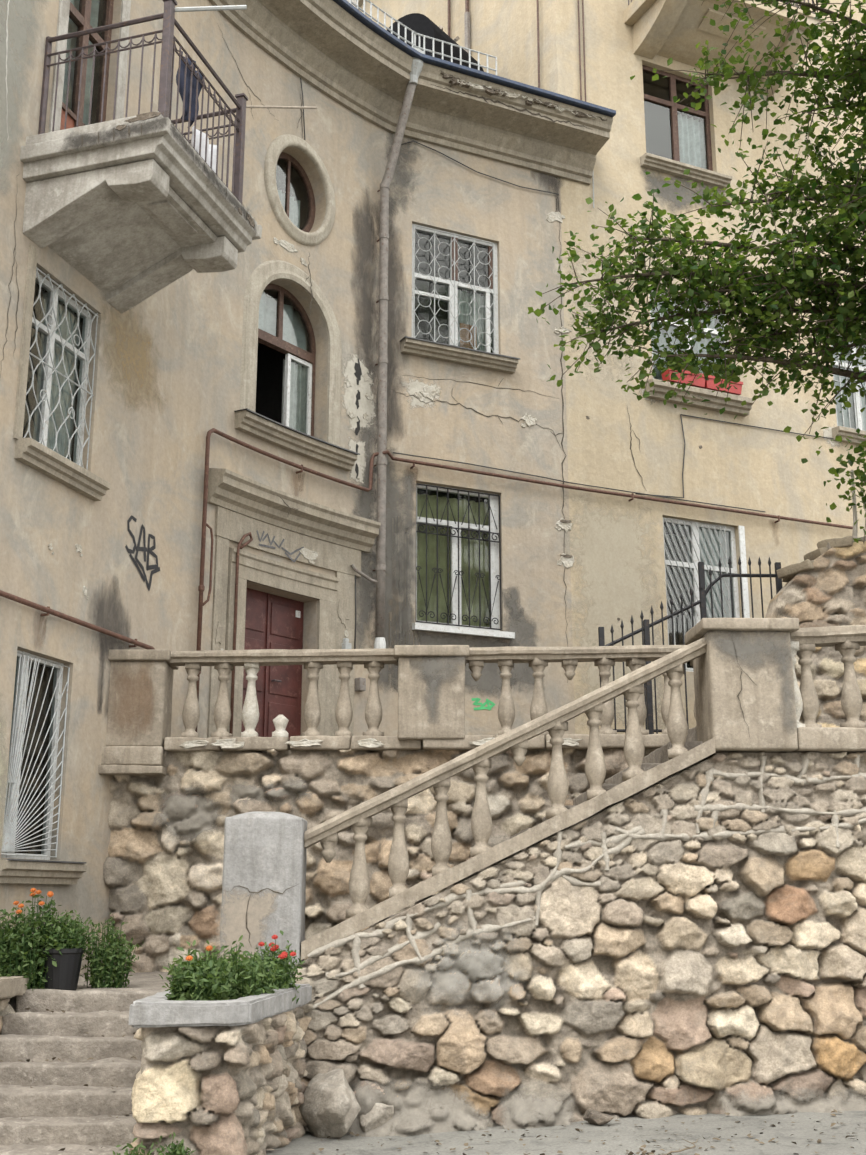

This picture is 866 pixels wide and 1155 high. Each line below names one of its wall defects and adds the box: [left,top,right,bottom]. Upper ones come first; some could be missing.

crack [0,0,19,376]
flaking render [341,354,376,483]
leakage [354,133,536,720]
crack [388,179,568,645]
crack [627,407,645,488]
leakage [96,588,128,711]
crack [223,884,298,947]